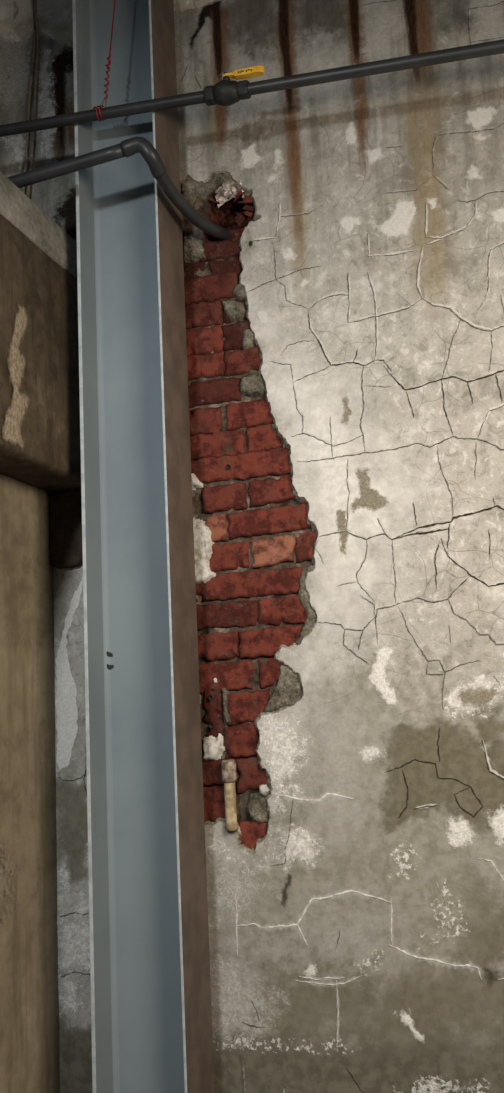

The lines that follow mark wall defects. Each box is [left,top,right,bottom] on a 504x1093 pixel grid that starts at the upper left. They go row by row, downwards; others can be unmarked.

rust [213,1,227,82]
rust [279,0,300,201]
rust [349,0,363,65]
rust [353,77,366,147]
rust [404,0,430,55]
spalling [180,144,318,854]
crack [244,123,504,818]
damp [205,646,504,1093]